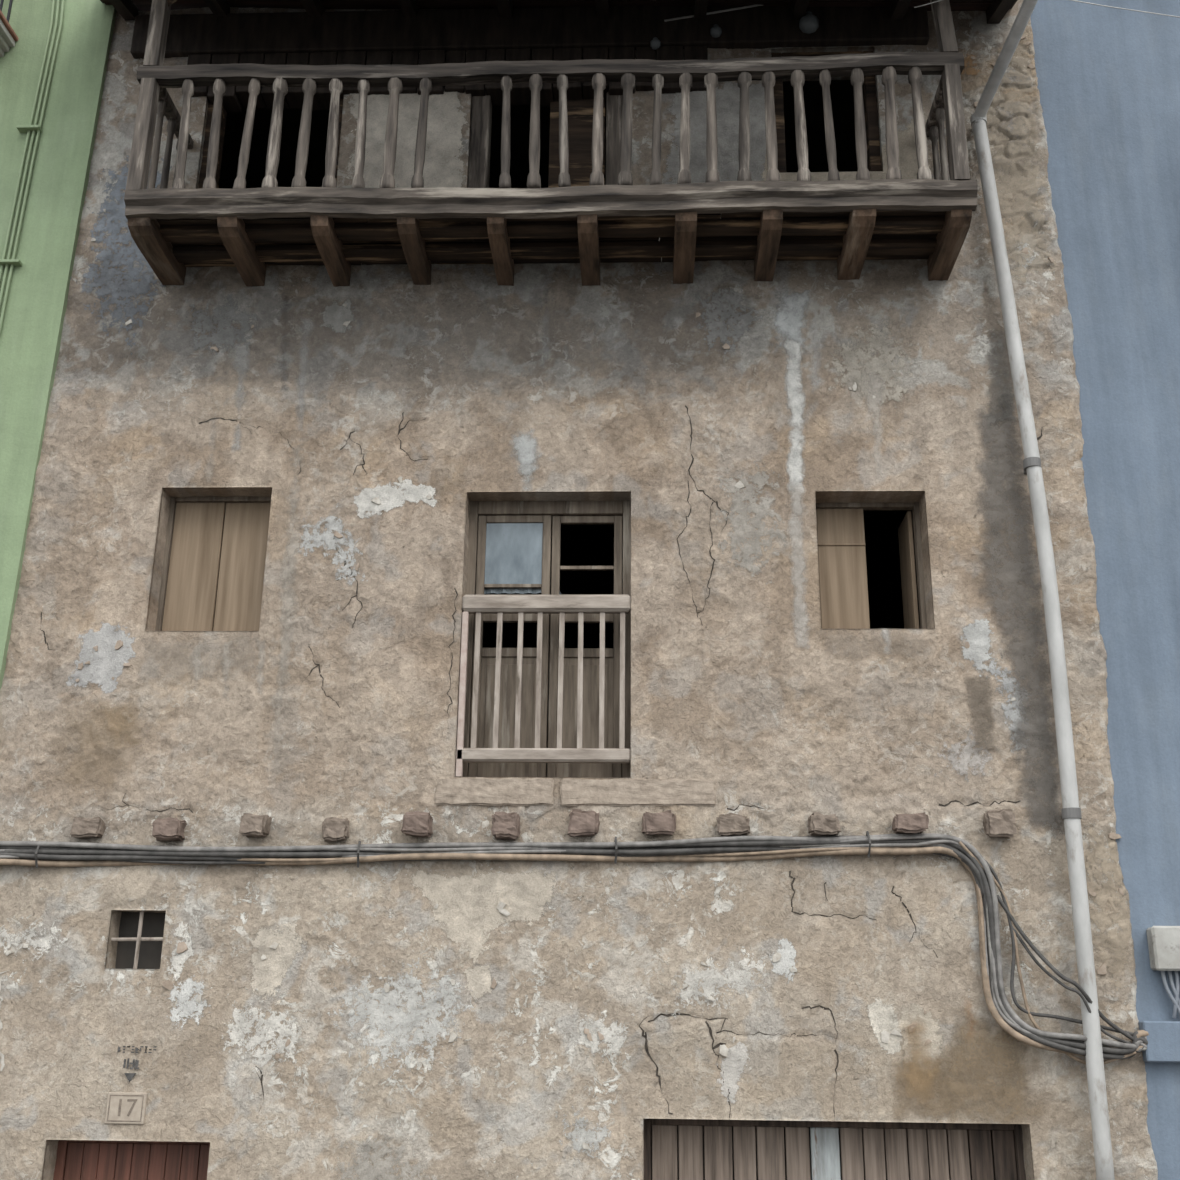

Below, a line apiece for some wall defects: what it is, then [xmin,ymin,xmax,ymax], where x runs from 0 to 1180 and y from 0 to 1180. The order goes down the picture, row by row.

peeling [296,504,368,589]
crack [335,542,363,628]
peeling [353,476,437,519]
crack [677,405,729,626]
water stain [775,291,808,646]
crack [304,646,340,708]
crack [789,871,876,920]
crack [891,886,938,958]
crack [639,1005,839,1118]